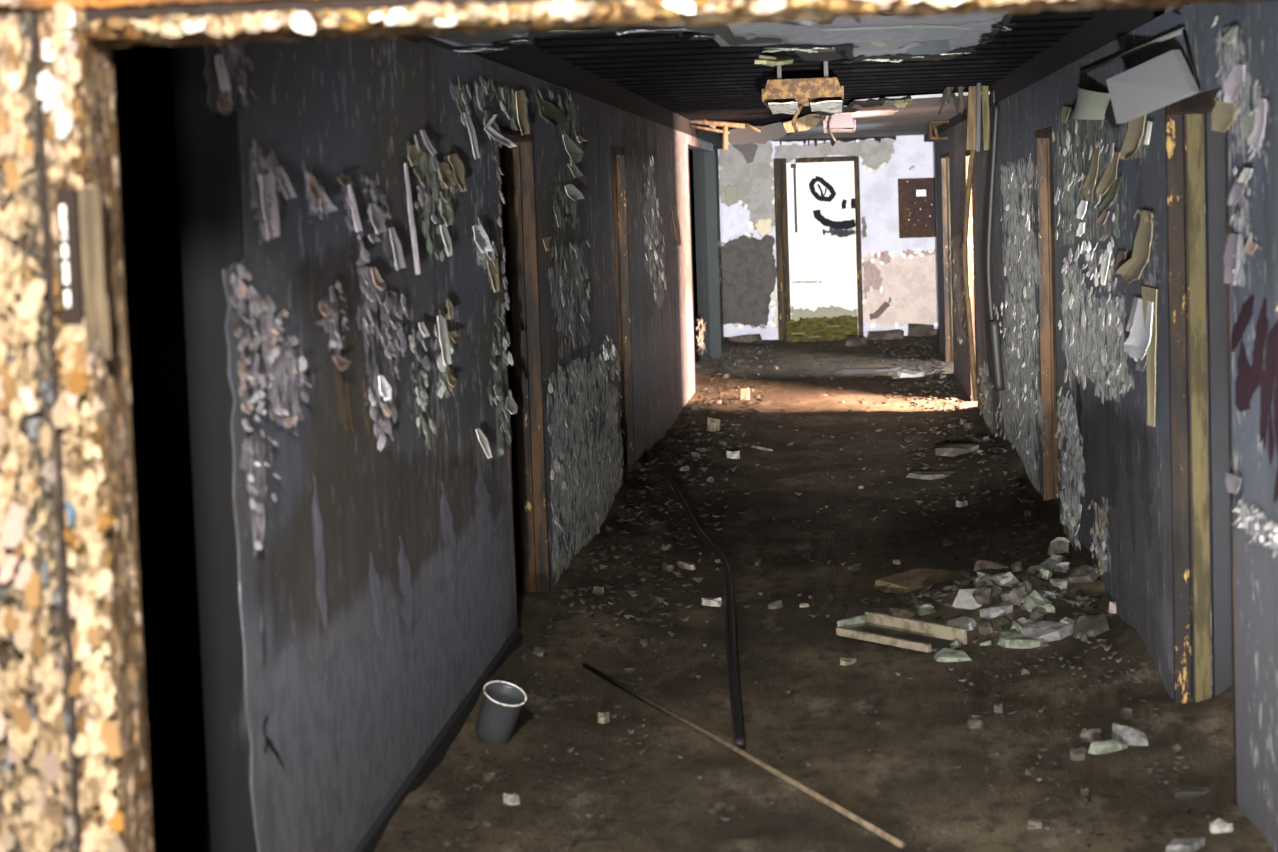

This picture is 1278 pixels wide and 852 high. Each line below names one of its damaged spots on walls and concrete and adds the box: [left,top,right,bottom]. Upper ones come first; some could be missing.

spalling [639,0,1028,55]
peeling [230,264,313,558]
peeling [248,76,625,588]
peeling [695,320,706,353]
spalling [718,138,894,329]
spalling [862,234,966,363]
peeling [977,100,1160,579]
peeling [1211,16,1277,287]
peeling [1225,473,1278,561]